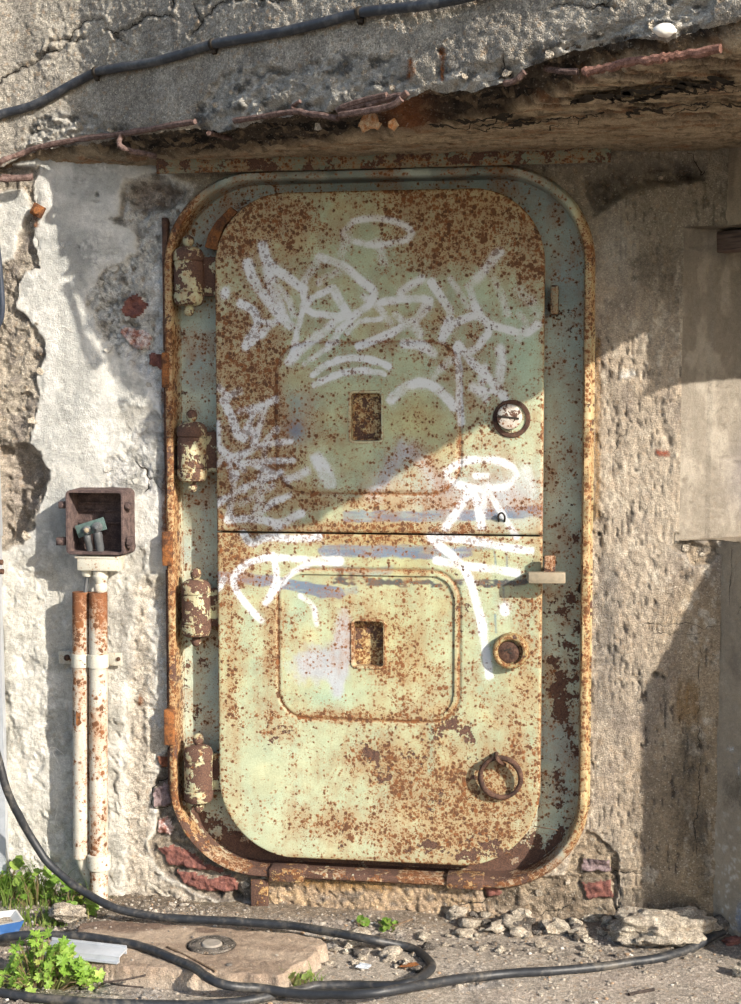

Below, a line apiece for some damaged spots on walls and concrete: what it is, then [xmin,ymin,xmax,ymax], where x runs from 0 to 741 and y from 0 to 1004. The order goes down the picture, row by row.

crack [1,0,286,83]
spalling [0,0,741,552]
spalling [673,533,722,567]
flaking render [147,753,262,904]